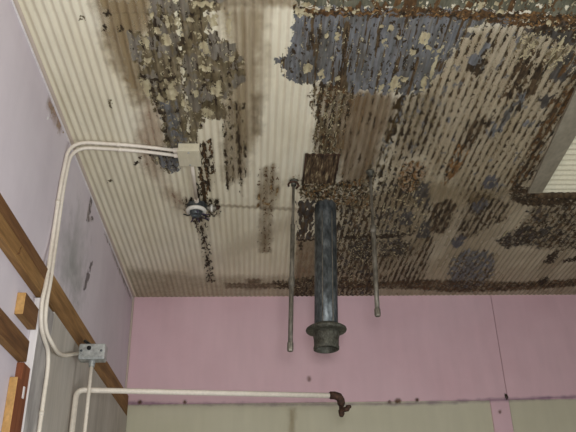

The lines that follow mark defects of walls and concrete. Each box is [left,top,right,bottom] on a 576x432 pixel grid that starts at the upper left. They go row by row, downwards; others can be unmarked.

corrosion [293,1,576,154]
peeling [117,0,247,283]
corrosion [256,167,279,253]
corrosion [293,176,375,210]
corrosion [398,160,428,193]
peeling [272,0,576,297]
corrosion [441,141,469,186]
corrosion [509,183,576,208]
corrosion [543,249,576,264]
corrosion [338,277,576,293]